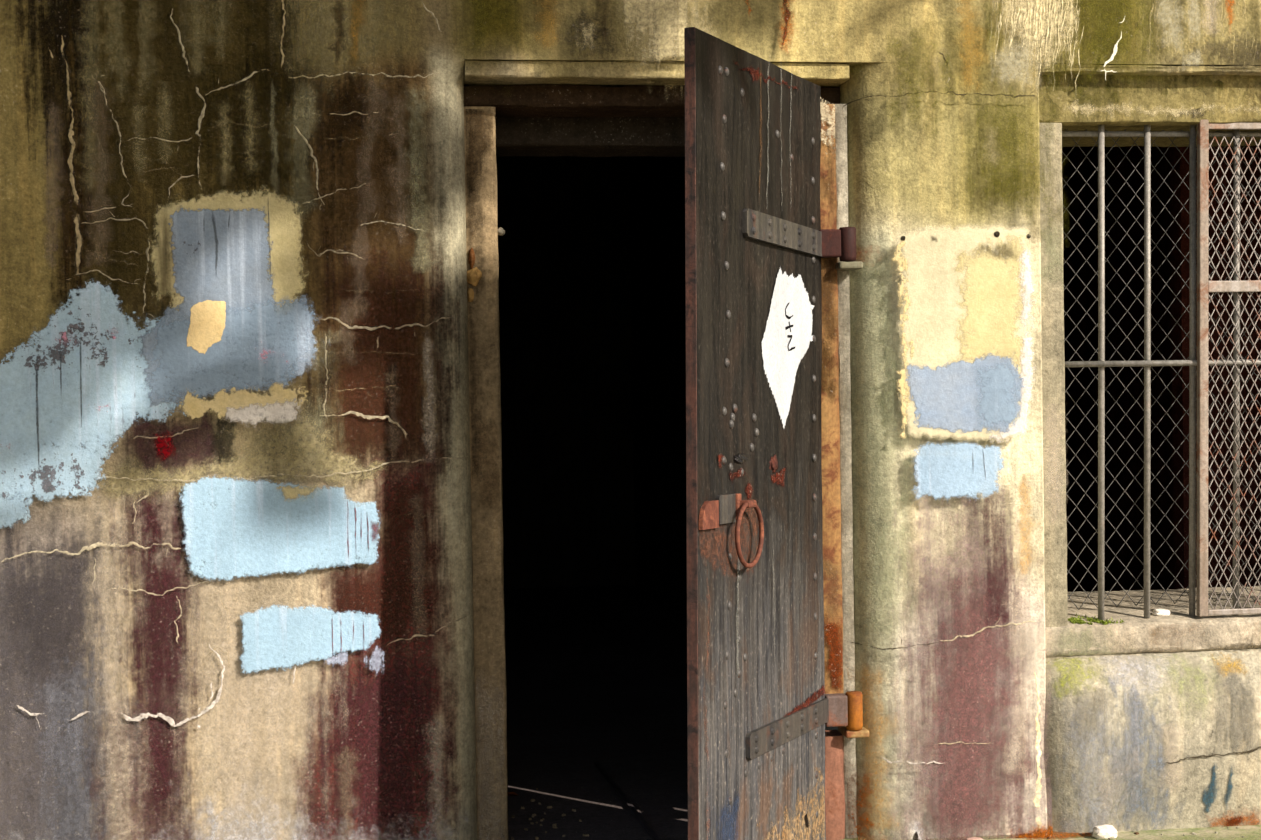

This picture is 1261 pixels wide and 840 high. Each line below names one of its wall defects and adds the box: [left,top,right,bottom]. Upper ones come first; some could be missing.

leakage [624,0,687,67]
leakage [887,30,950,134]
crack [67,8,440,315]
rust [820,97,836,201]
peeling [17,306,141,374]
leakage [0,0,459,840]
crack [236,290,467,480]
peeling [2,453,99,499]
crack [1,476,206,643]
crack [122,642,225,728]
rust [785,620,890,840]
rust [1212,814,1260,826]